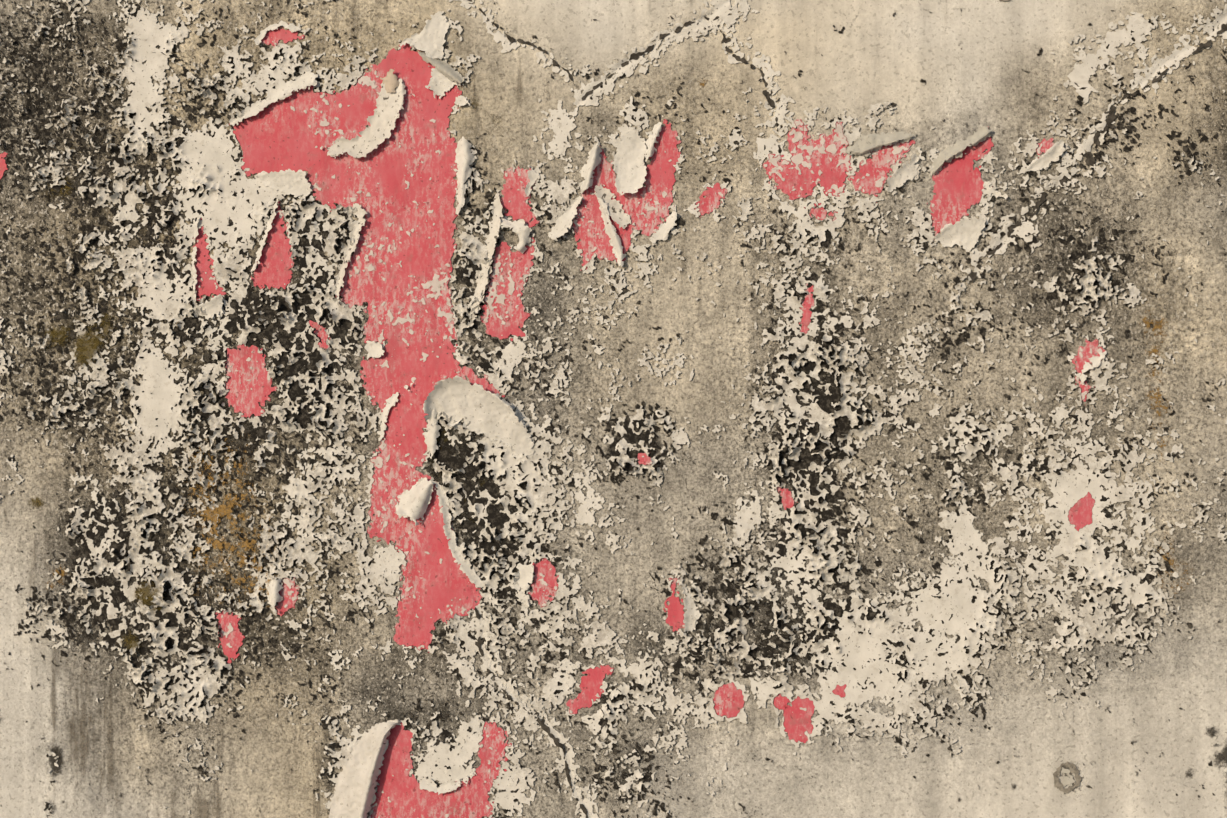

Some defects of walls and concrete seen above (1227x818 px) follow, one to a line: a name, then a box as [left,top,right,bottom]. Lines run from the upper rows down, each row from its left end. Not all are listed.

crack [449,0,795,134]
peeling [568,0,759,106]
damp [0,0,169,262]
crack [957,4,1227,298]
peeling [1160,121,1223,186]
damp [982,198,1161,335]
peeling [637,330,693,386]
peeling [1146,351,1179,373]
peeling [1190,377,1227,424]
peeling [1212,513,1227,544]
peeling [273,693,306,725]
peeling [172,734,223,781]